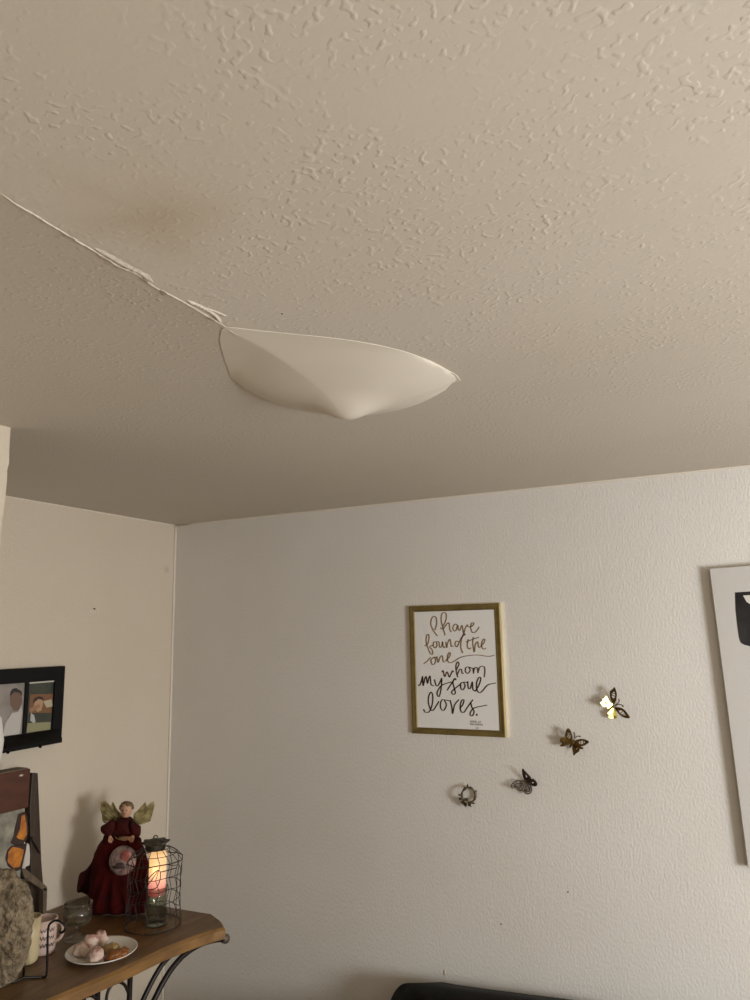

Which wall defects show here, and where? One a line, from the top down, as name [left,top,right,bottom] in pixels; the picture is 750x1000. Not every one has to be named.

crack [0,193,227,328]